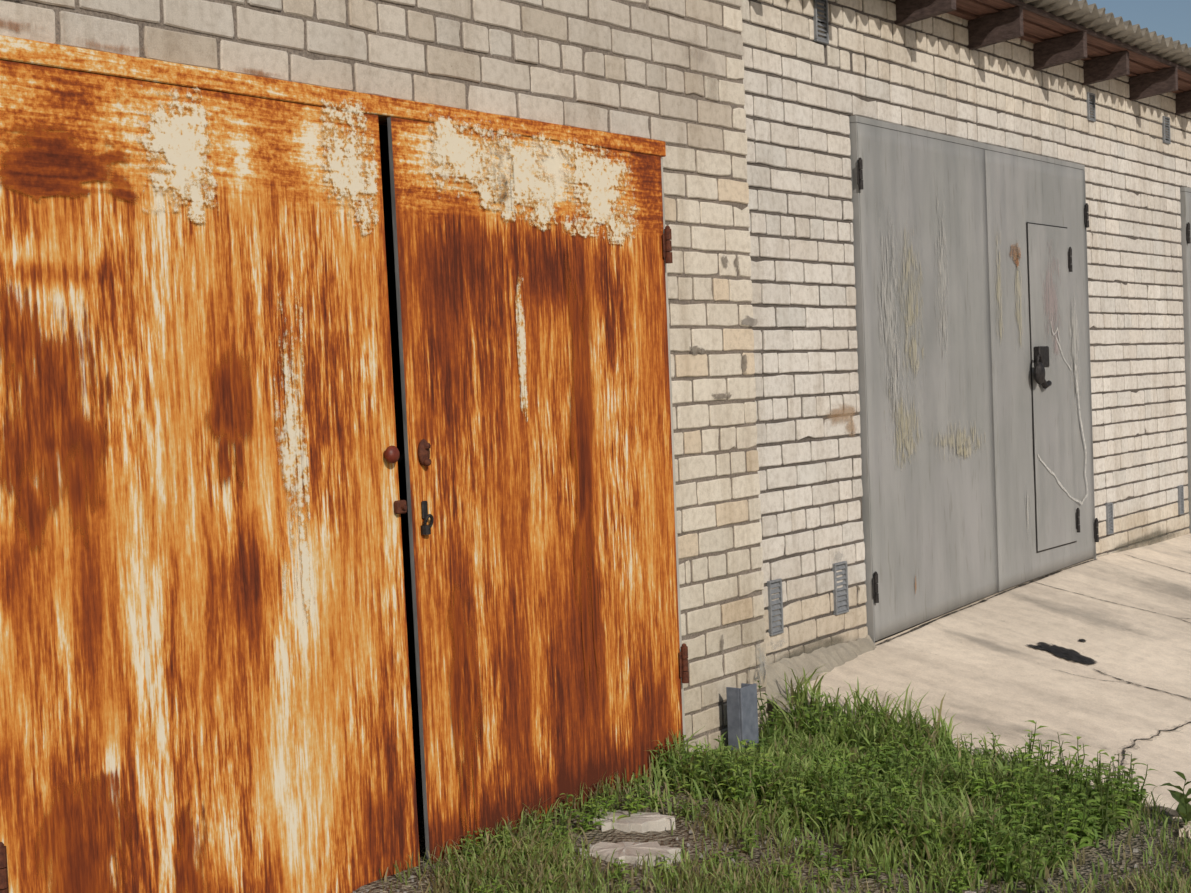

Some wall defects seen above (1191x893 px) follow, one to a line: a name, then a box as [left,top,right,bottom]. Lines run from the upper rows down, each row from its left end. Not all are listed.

rust [0,123,137,202]
peeling [137,89,218,223]
peeling [320,99,379,235]
peeling [427,114,638,245]
rust [0,276,111,552]
rust [206,342,254,487]
peeling [274,290,311,623]
rust [565,253,599,695]
rust [449,583,484,839]
crack [1058,669,1191,775]
rust [36,769,133,893]
rust [175,799,210,893]